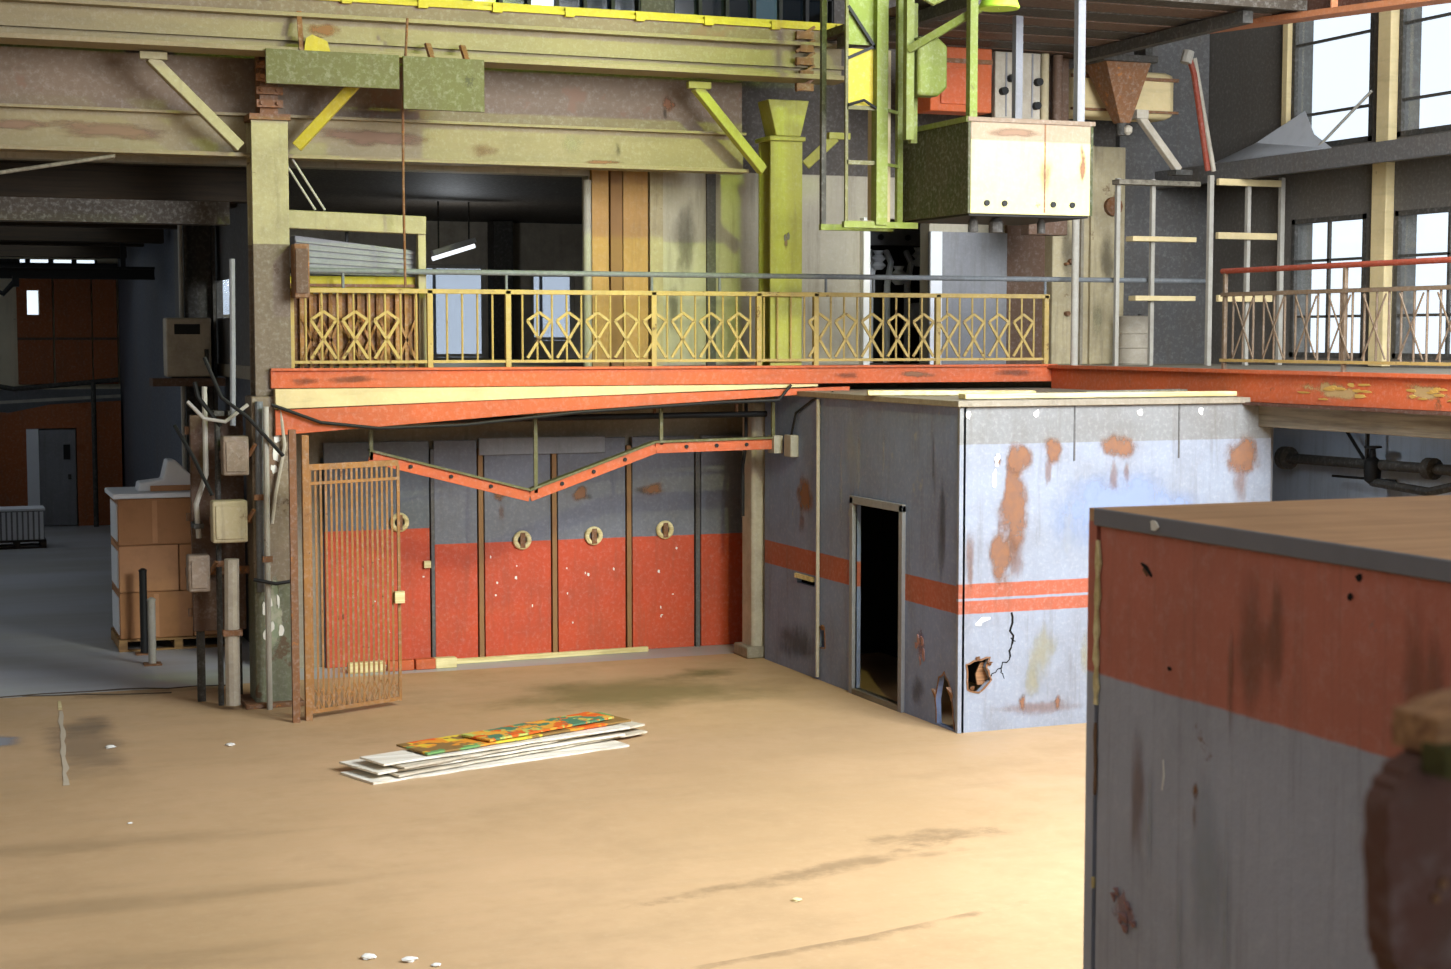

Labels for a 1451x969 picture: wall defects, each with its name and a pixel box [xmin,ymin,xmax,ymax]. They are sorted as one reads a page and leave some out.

rust [1103,436,1134,456]
rust [1228,438,1256,473]
rust [990,439,1062,580]
crack [987,612,1016,680]